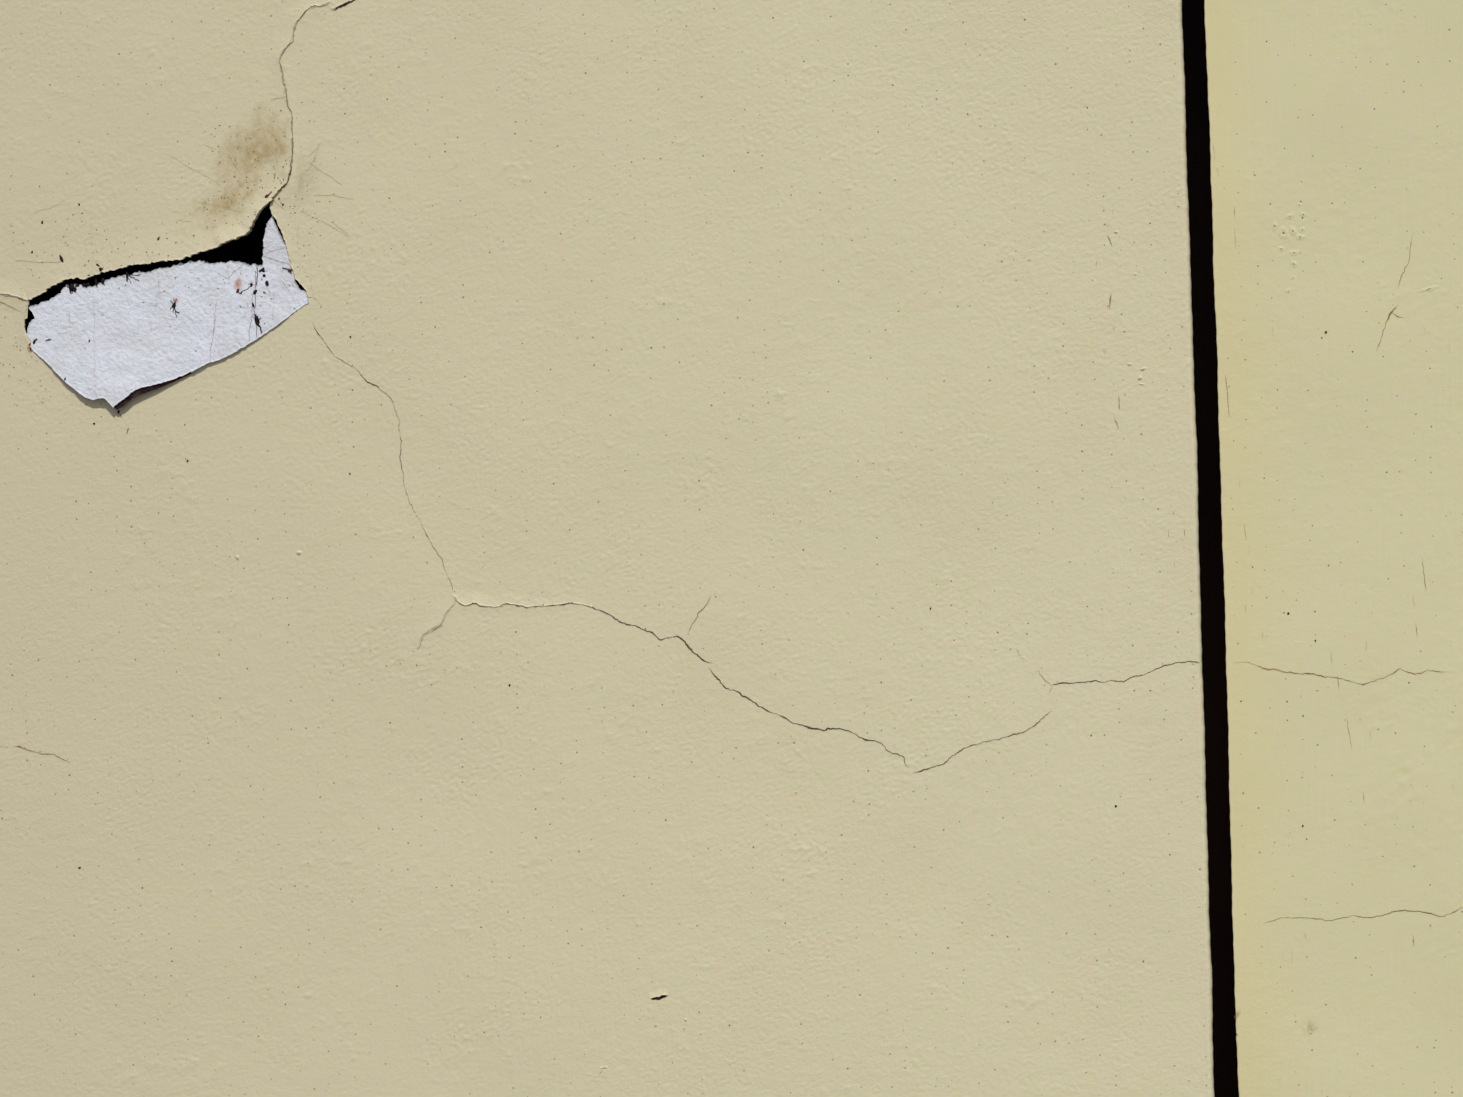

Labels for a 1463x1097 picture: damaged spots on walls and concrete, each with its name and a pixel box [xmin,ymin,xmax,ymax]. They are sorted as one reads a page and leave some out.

crack [249,0,354,213]
crack [0,274,28,319]
peeling [9,159,322,410]
crack [314,326,1199,772]
crack [1245,606,1440,686]
crack [1265,907,1461,943]